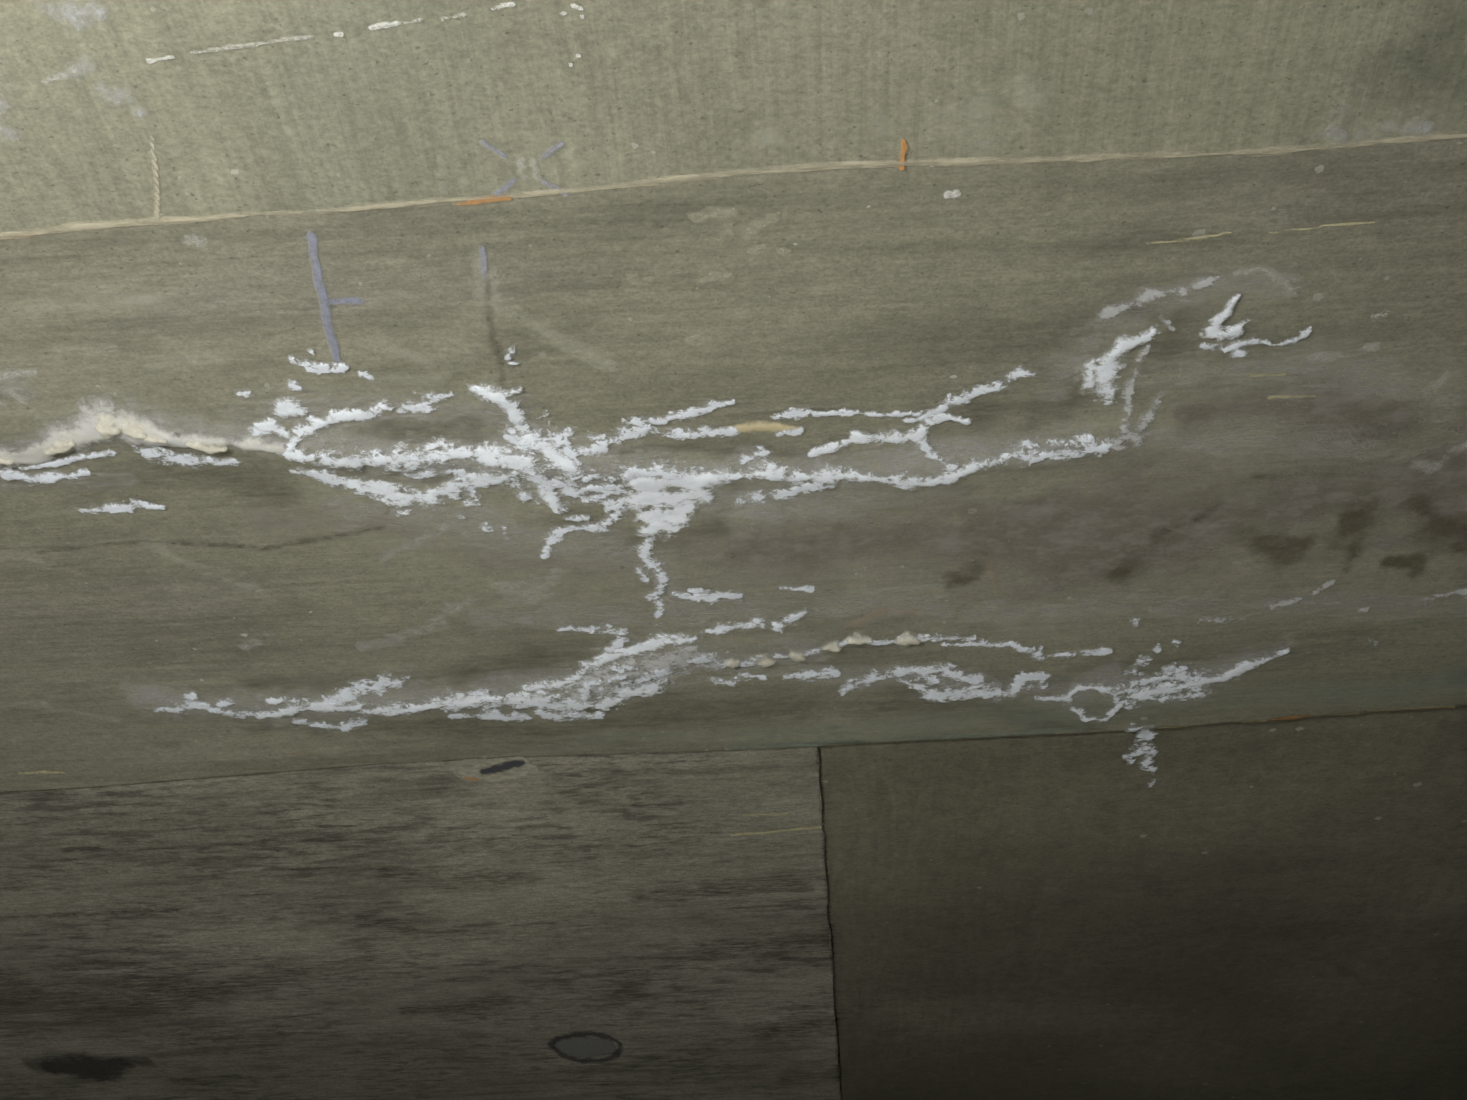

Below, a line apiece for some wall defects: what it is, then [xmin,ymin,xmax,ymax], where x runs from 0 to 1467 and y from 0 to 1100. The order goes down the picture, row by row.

crack [504,347,519,365]
leakage [0,267,1467,788]